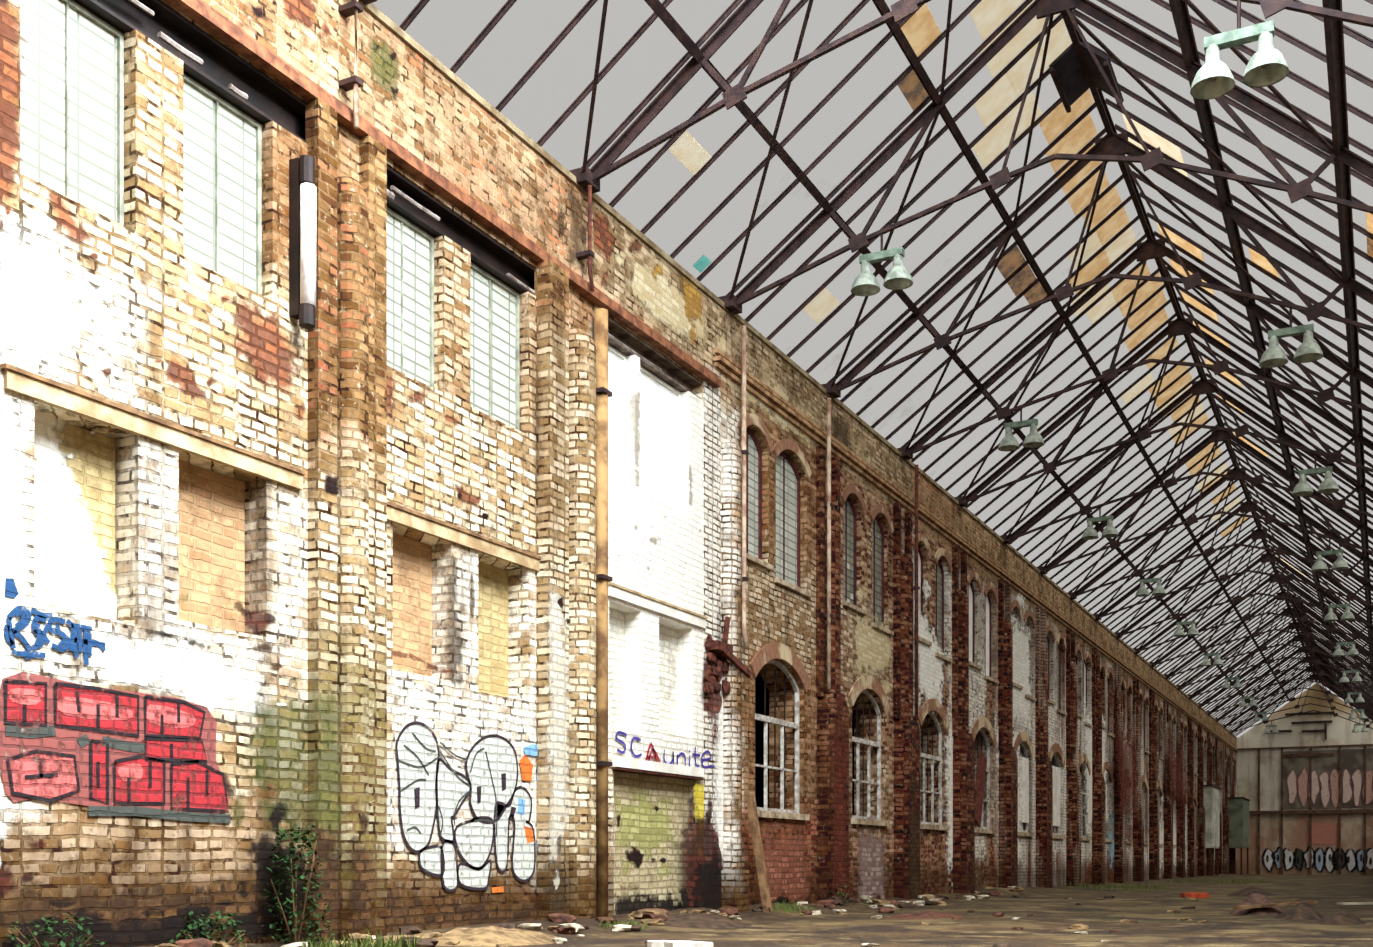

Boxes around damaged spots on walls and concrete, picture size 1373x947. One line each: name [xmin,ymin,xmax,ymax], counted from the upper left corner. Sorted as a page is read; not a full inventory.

spalling [0,0,25,228]
spalling [37,183,98,259]
spalling [156,360,214,399]
flaking render [0,375,278,715]
peeling [0,784,8,838]
flaking render [913,579,954,893]